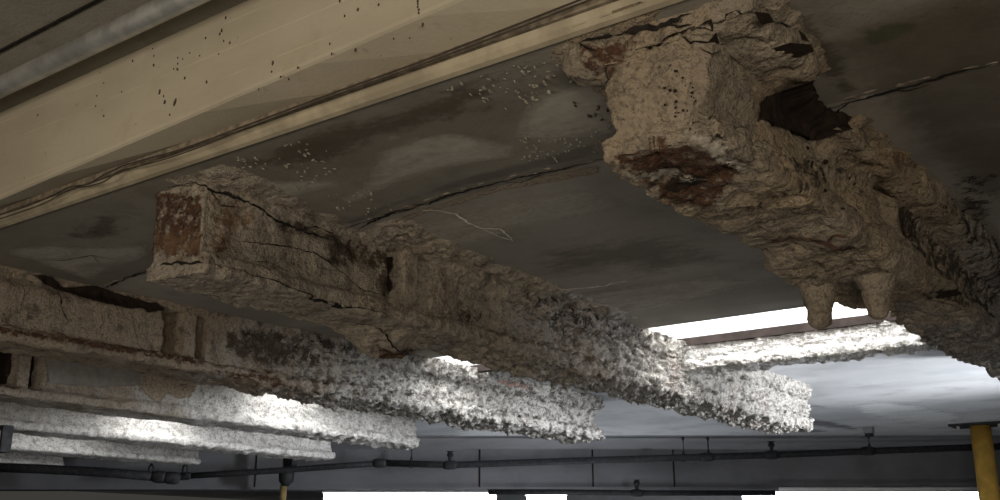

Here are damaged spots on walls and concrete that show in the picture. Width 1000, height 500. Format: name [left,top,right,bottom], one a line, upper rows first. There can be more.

crack [681,19,723,55]
leakage [264,88,484,164]
leakage [523,87,613,137]
spalling [758,81,852,167]
leakage [357,135,510,198]
corrosion [152,189,255,259]
crack [43,159,598,352]
peeling [135,302,165,313]